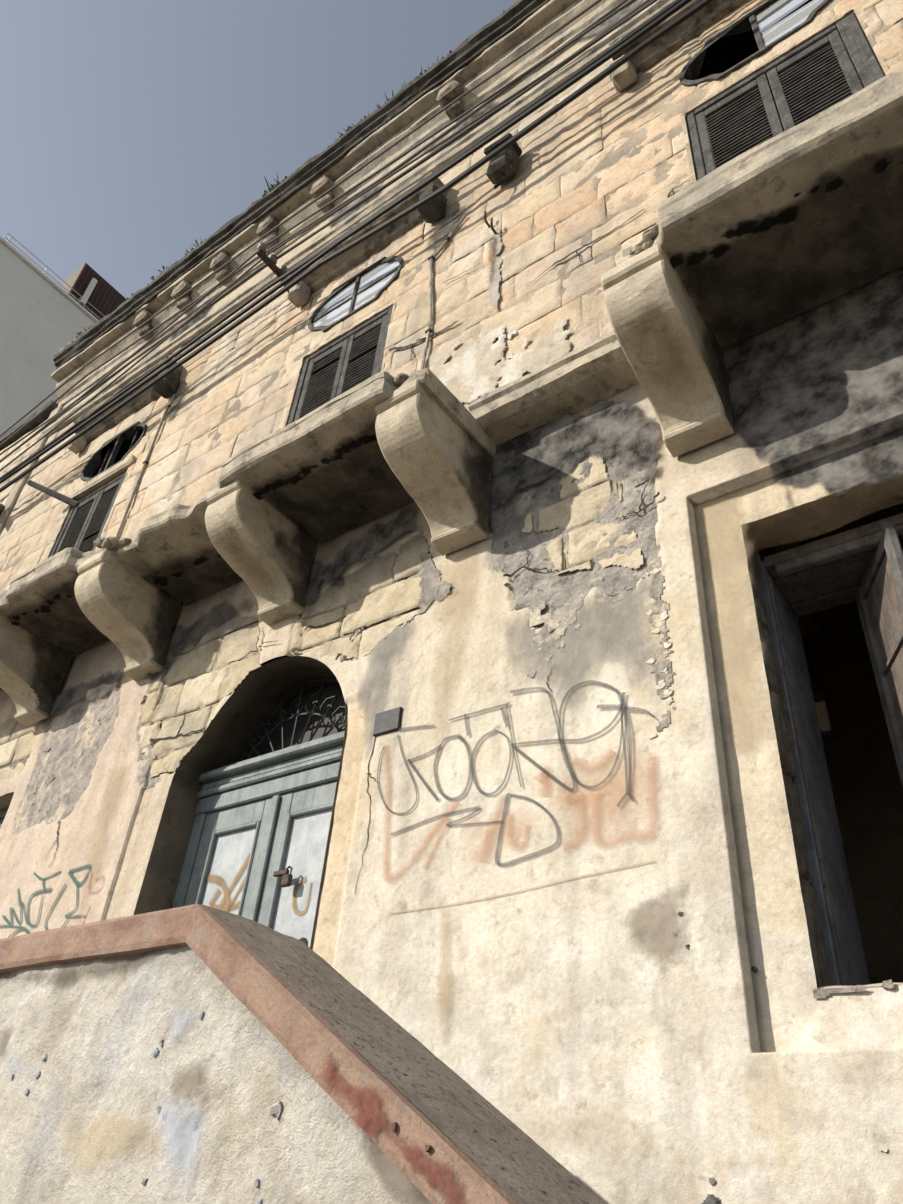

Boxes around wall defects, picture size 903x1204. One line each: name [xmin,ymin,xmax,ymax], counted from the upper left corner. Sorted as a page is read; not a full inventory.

peeling [393,317,577,403]
peeling [489,451,675,739]
peeling [0,685,121,838]
crack [355,736,379,890]
leakage [630,895,690,959]
spalling [701,1178,720,1204]